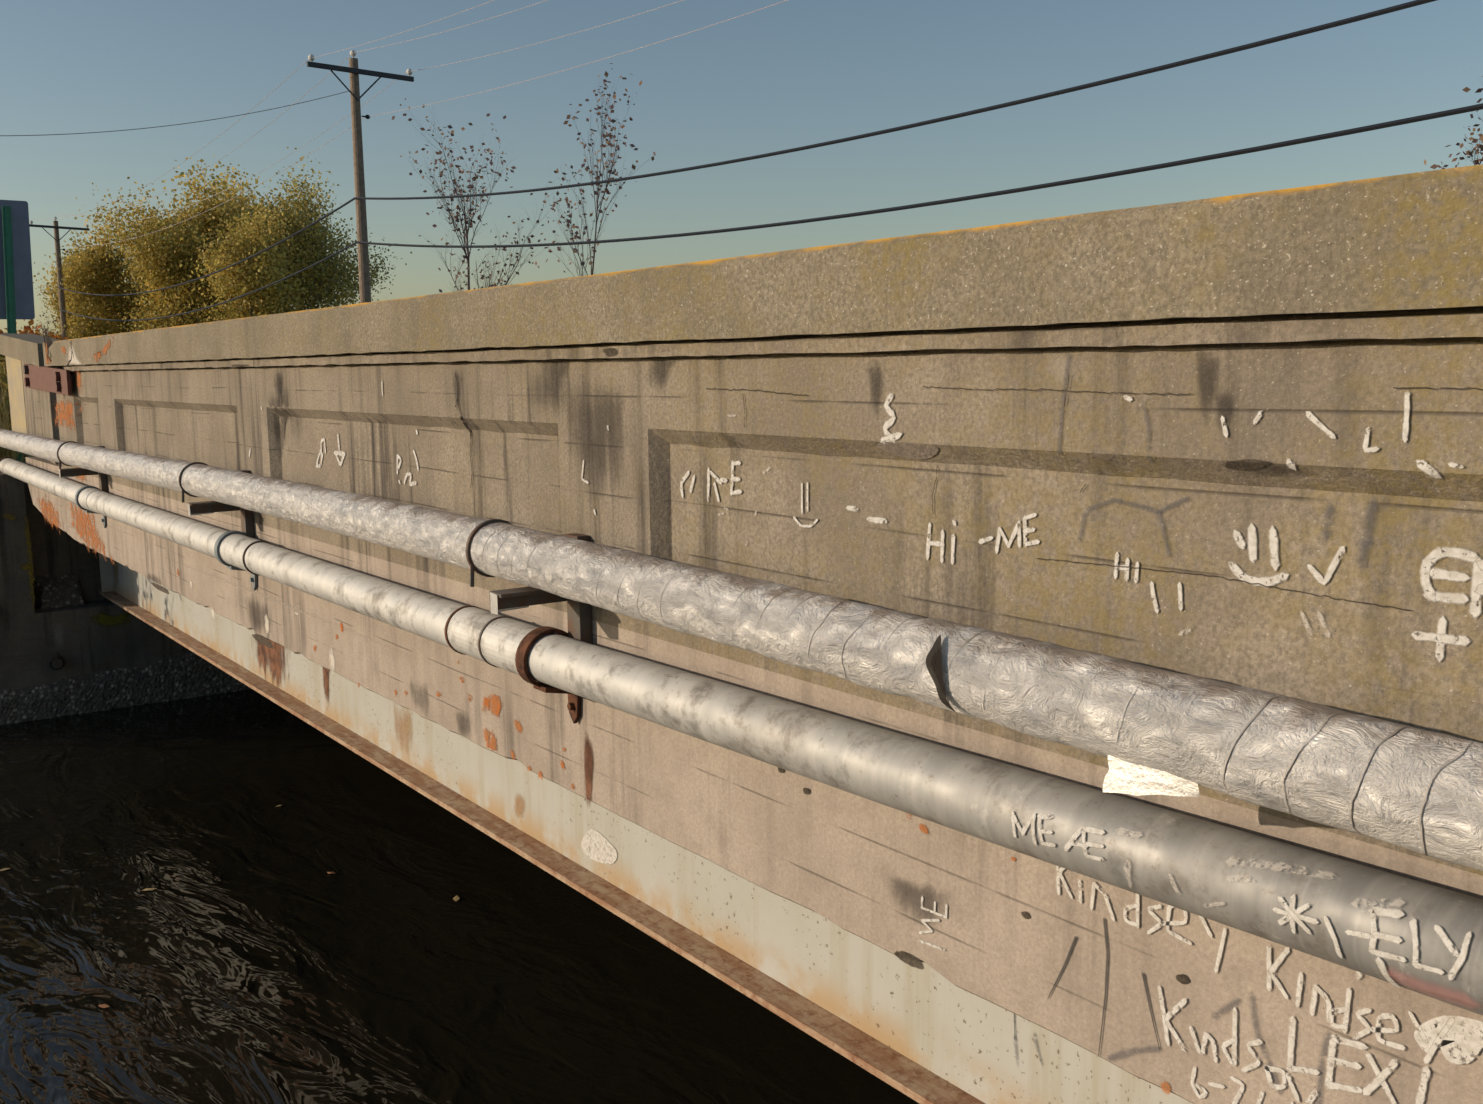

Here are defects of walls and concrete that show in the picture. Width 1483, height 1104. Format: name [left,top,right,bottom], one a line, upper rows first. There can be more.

rust [39,495,118,575]
rust [257,634,285,684]
rust [458,662,543,780]
rust [561,739,593,804]